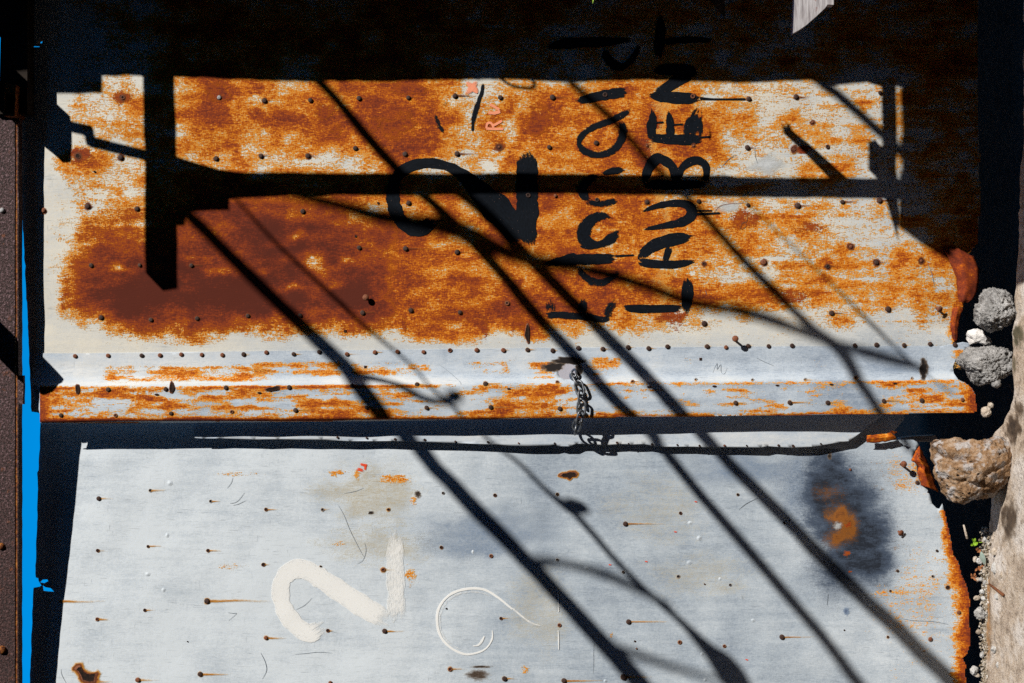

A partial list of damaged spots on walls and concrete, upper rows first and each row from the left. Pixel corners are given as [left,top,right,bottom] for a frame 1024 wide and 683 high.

corrosion [40,0,981,423]
corrosion [71,662,103,683]
damp [700,449,895,595]
corrosion [872,510,970,683]